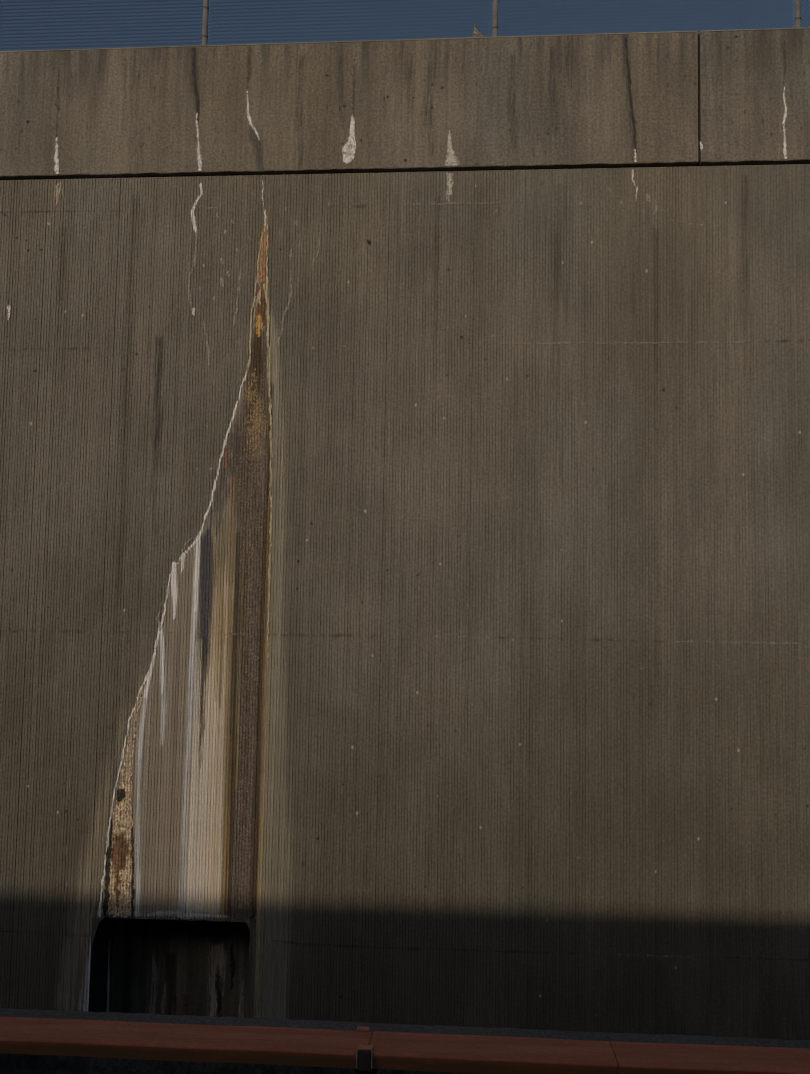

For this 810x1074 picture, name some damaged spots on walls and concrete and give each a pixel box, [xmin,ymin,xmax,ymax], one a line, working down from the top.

leakage [54,137,64,205]
leakage [247,91,262,170]
leakage [446,173,454,204]
rust [254,215,269,337]
leakage [75,215,294,1019]
spalling [102,684,144,918]